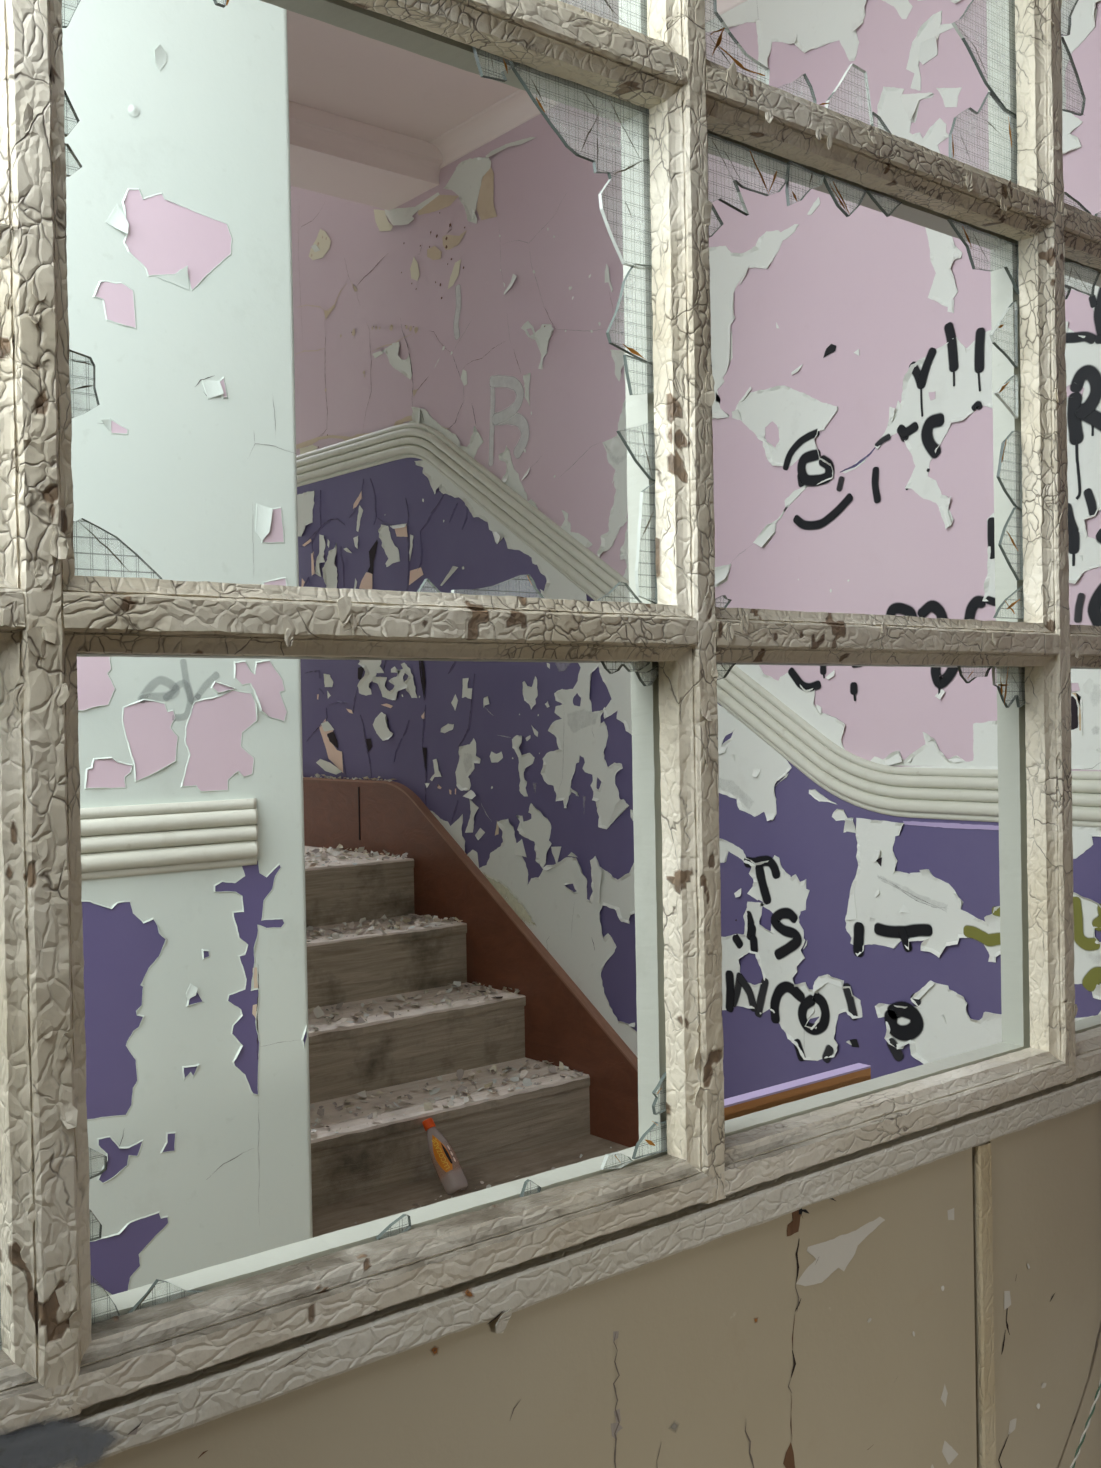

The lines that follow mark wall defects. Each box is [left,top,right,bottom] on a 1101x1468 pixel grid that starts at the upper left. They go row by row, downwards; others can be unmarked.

peeling [1050,0,1101,169]
peeling [689,197,993,587]
peeling [1050,321,1101,584]
peeling [54,657,288,793]
peeling [1055,651,1101,787]
peeling [60,900,167,1185]
peeling [214,859,286,1120]
peeling [430,661,638,1058]
peeling [719,838,1002,1064]
peeling [809,789,1001,963]
crack [611,1331,623,1468]
crack [745,1242,801,1468]